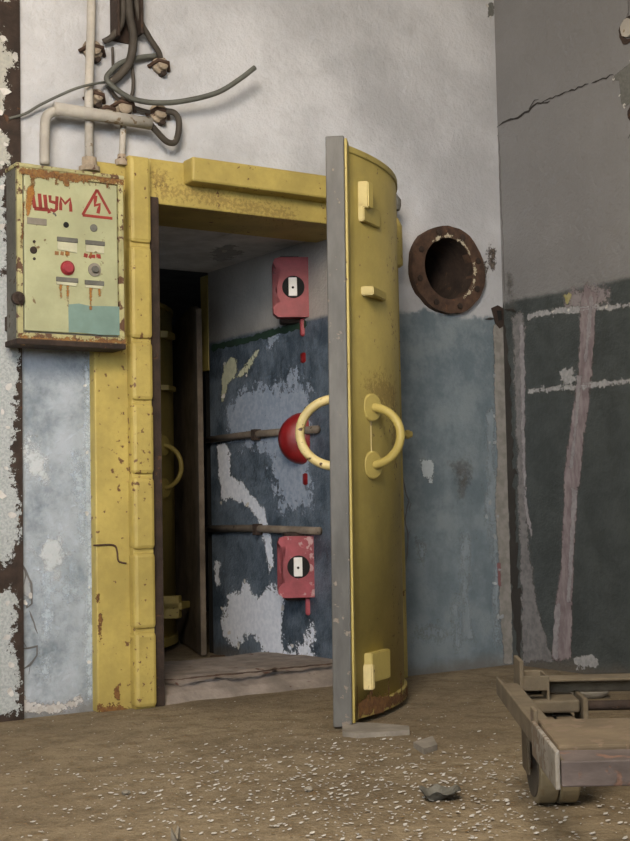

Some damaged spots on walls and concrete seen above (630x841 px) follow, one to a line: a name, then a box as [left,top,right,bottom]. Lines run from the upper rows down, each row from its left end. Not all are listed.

peeling [0,26,19,115]
rust [19,167,125,248]
peeling [0,129,22,570]
peeling [220,328,280,402]
crack [497,74,613,664]
peeling [527,303,630,321]
peeling [528,366,630,394]
peeling [217,442,274,573]
flaking render [485,305,516,664]
peeling [220,579,317,656]
rust [356,671,408,722]
peeling [574,654,599,672]